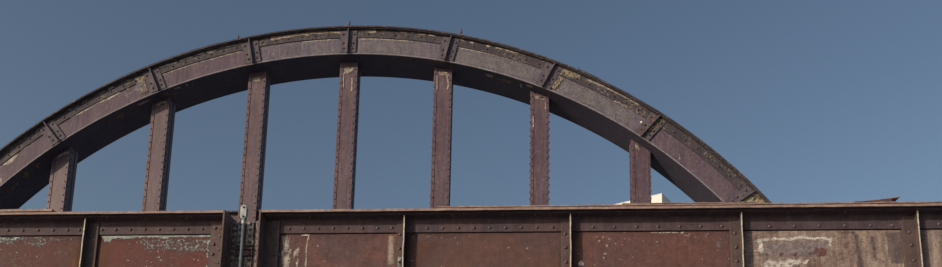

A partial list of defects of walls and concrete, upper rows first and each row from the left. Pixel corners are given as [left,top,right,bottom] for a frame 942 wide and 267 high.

peeling [0,237,72,257]
peeling [102,235,211,267]
peeling [279,234,333,267]
peeling [755,232,832,267]